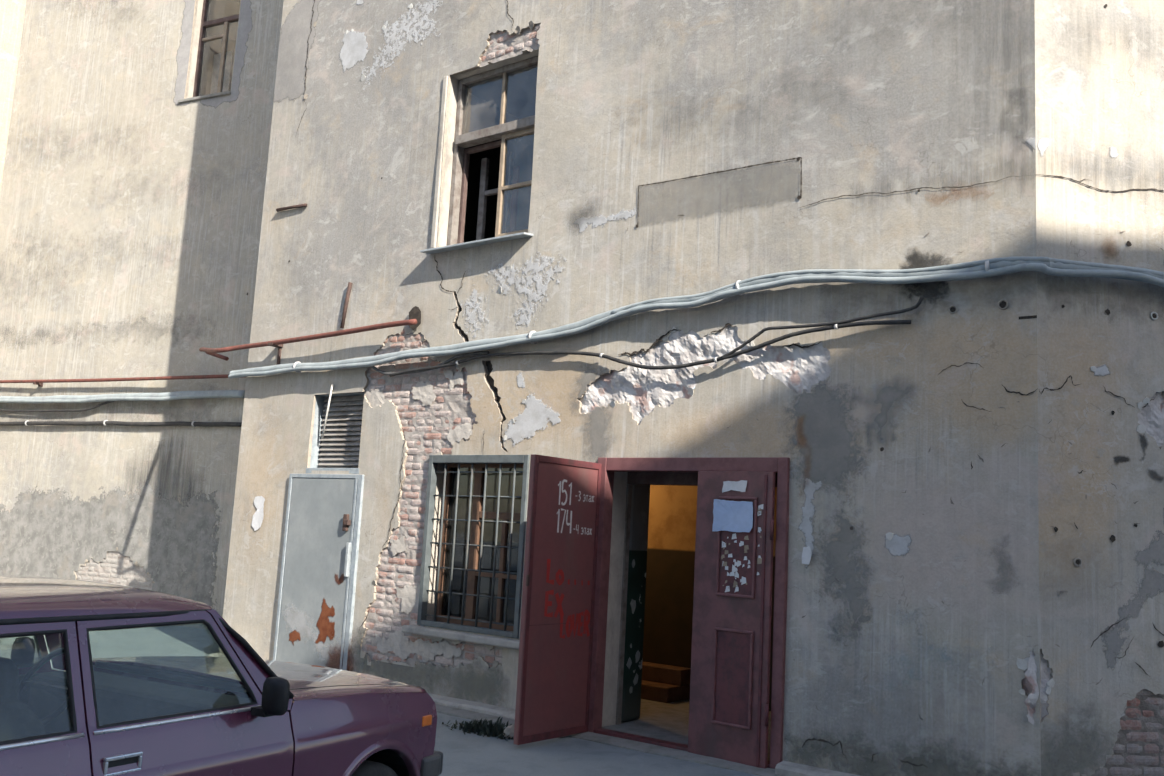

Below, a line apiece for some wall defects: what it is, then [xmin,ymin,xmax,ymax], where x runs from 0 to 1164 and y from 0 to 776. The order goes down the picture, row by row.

peeling [339,0,443,89]
crack [800,174,1164,208]
crack [435,260,508,452]
flaking render [580,325,832,425]
water stain [787,383,912,489]
crack [938,362,1156,412]
flaking render [361,306,504,668]
flaking render [0,478,221,610]
water stain [821,511,871,641]
rust [289,630,301,646]
rust [315,599,353,671]
flaking render [1072,689,1164,776]